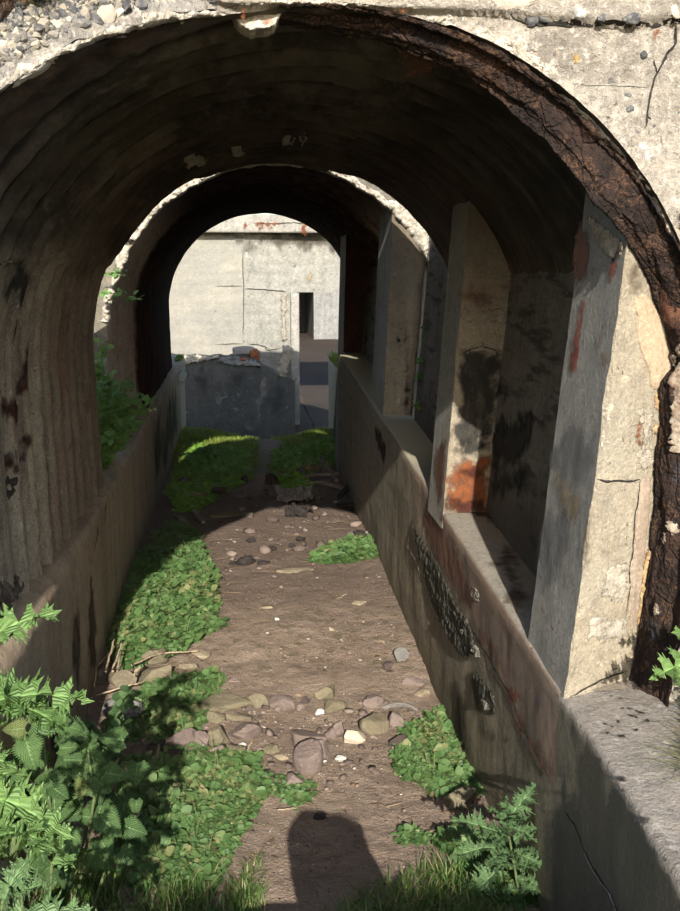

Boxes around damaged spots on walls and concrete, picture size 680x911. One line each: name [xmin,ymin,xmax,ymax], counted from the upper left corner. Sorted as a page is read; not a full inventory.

spalling [0,0,675,237]
crack [510,14,680,129]
spalling [101,146,302,322]
spalling [320,170,431,266]
rust [573,223,589,280]
spalling [178,354,261,384]
rust [424,440,492,608]
damp [492,412,532,497]
peeling [587,293,680,644]
spalling [415,527,480,658]
crack [467,619,549,778]
crack [565,812,617,911]